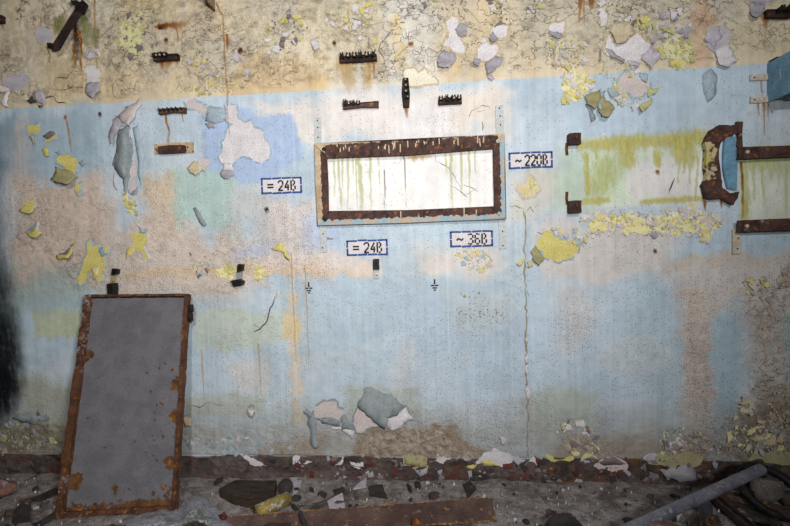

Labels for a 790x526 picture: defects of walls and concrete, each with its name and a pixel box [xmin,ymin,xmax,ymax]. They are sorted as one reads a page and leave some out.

peeling [256,13,321,56]
peeling [402,66,439,88]
peeling [422,0,511,80]
peeling [547,0,739,121]
peeling [176,53,272,179]
peeling [26,122,85,197]
leakage [577,129,707,205]
peeling [76,239,112,287]
peeling [517,202,724,268]
crack [511,205,534,459]
flaking render [303,263,790,483]
peeling [183,415,322,478]